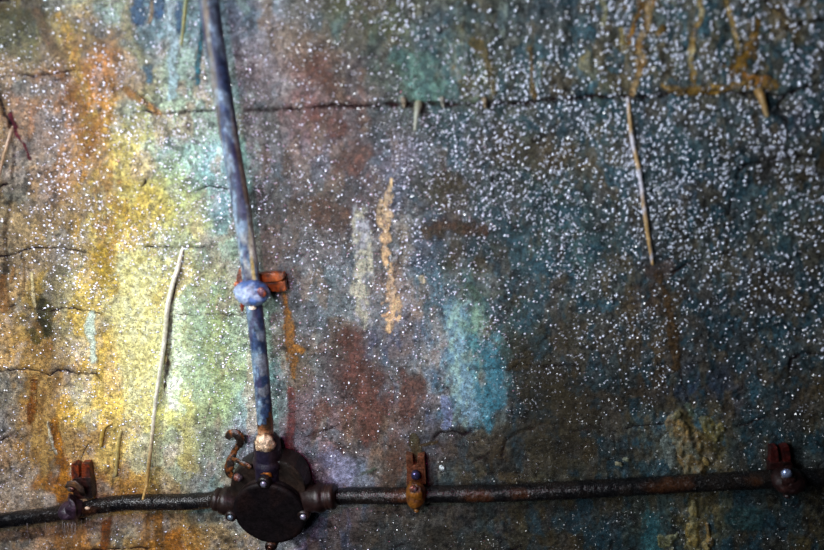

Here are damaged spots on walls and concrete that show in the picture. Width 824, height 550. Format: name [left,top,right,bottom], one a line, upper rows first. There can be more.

rust [661,18,779,96]
crack [0,98,15,126]
crack [137,92,214,114]
crack [245,91,674,114]
rust [57,14,139,271]
crack [0,247,86,258]
crack [0,368,102,381]
rust [18,314,71,503]
water stain [660,402,726,474]
rust [100,520,111,549]
rust [146,510,183,550]
water stain [641,500,714,550]